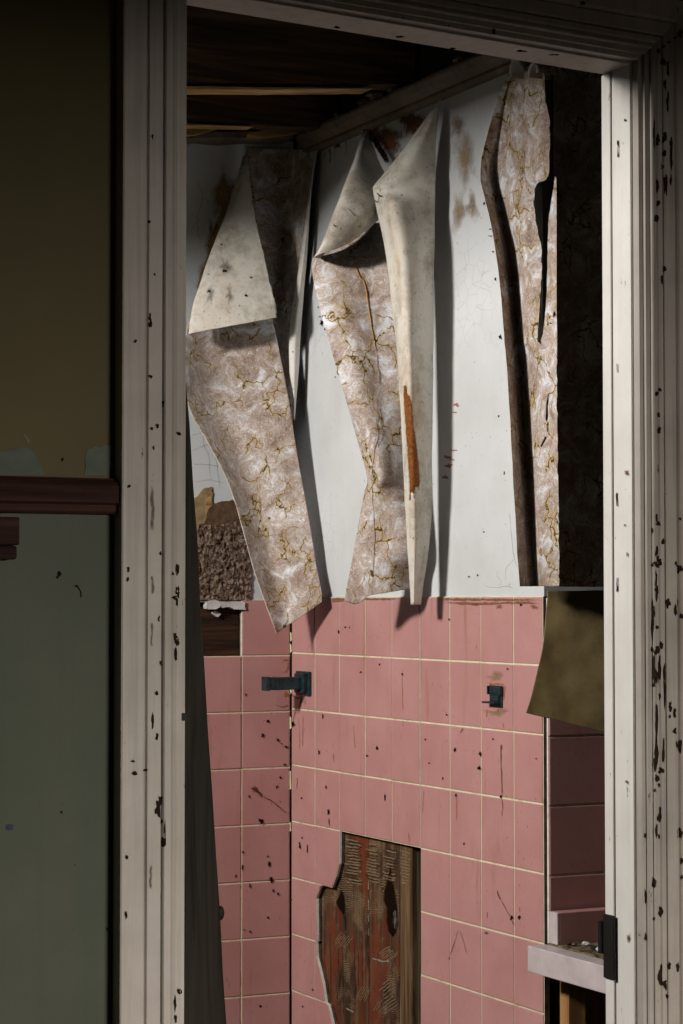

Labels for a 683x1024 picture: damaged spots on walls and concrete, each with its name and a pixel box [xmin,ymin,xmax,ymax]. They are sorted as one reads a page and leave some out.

peeling [369,130,389,163]
leakage [455,121,470,176]
leakage [456,197,485,220]
peeling [0,434,43,475]
peeling [84,442,115,475]
spalling [194,487,251,617]
spalling [336,890,346,930]
spalling [383,865,397,936]